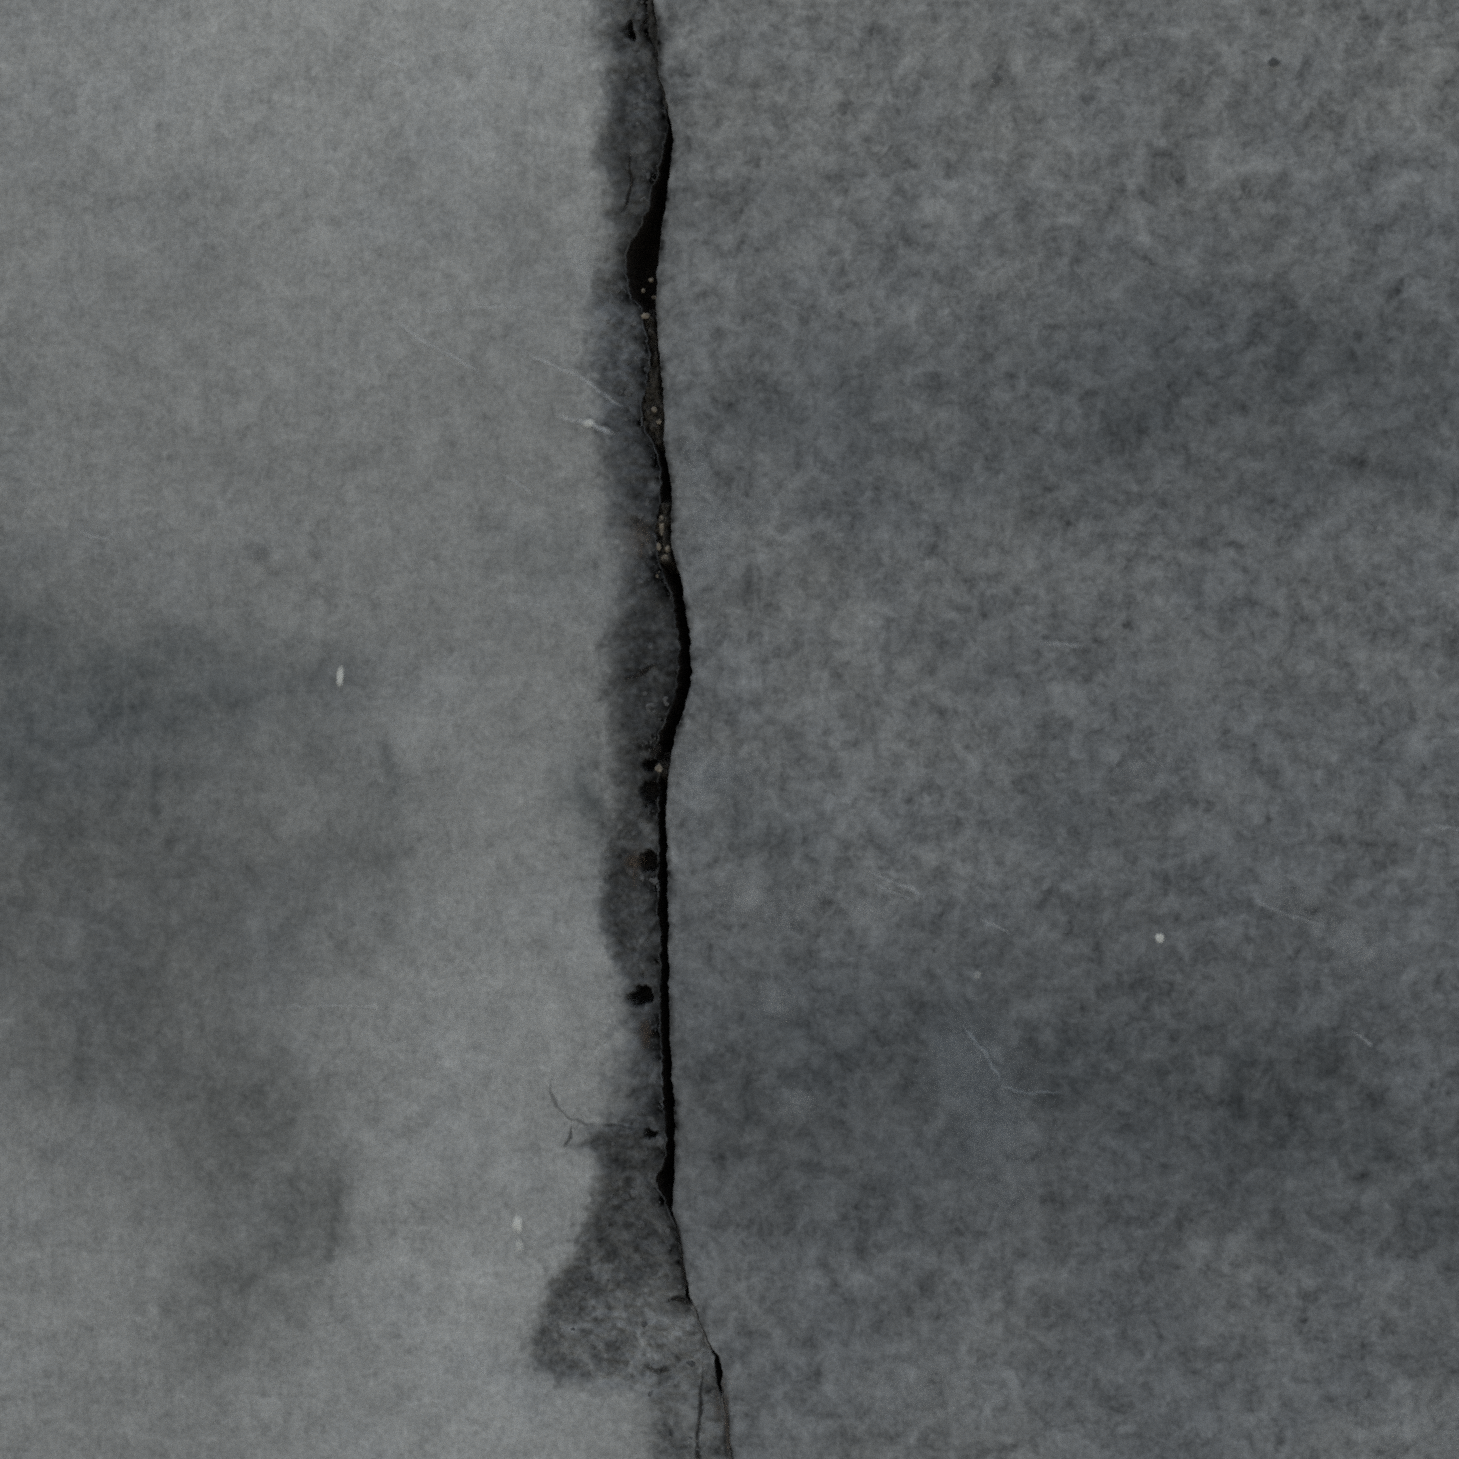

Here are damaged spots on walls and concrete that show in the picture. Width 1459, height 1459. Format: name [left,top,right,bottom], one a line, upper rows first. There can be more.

spalling [513,0,729,1459]
crack [621,0,733,1459]